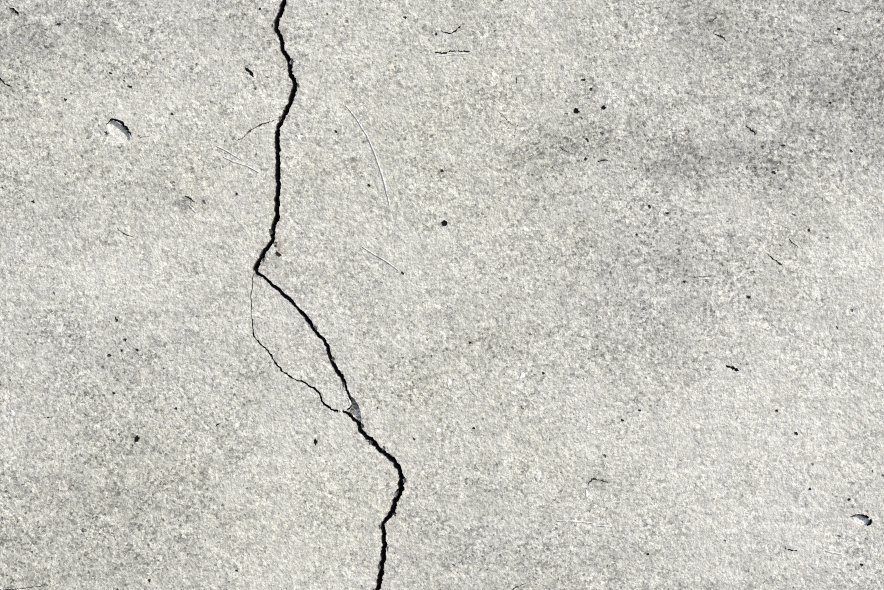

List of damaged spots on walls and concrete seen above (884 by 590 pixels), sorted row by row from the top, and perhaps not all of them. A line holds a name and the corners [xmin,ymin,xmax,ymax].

crack [238,0,407,590]